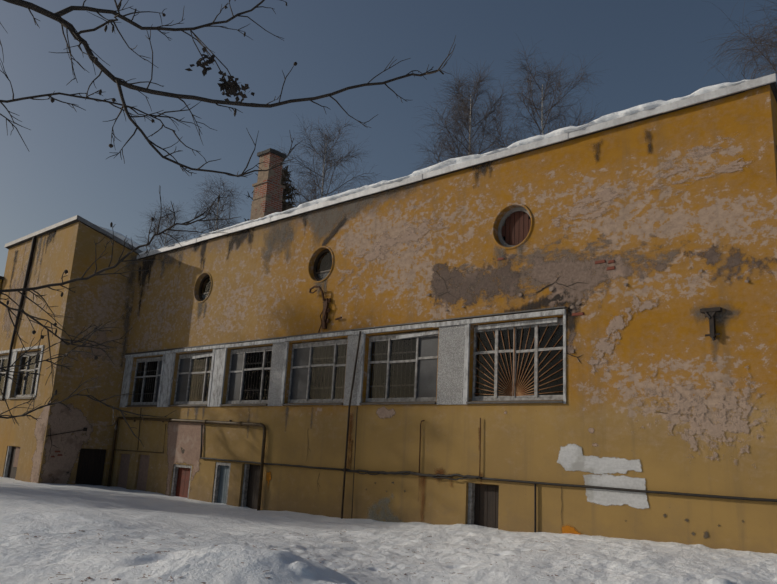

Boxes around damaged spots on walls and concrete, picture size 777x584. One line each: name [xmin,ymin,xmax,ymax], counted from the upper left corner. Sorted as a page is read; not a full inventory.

peeling [551,137,751,229]
spalling [426,234,777,316]
peeling [587,296,659,372]